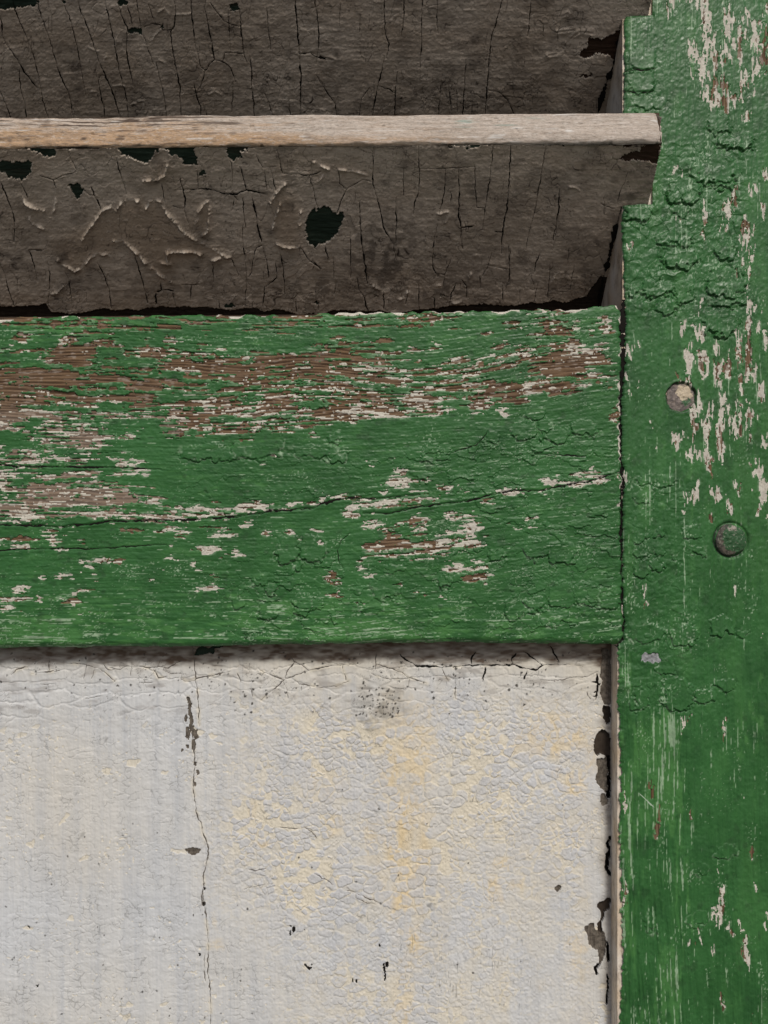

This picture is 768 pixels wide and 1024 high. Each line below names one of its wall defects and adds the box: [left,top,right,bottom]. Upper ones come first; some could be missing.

crack [0,0,438,118]
peeling [666,0,768,122]
peeling [118,148,206,177]
peeling [305,206,344,248]
crack [0,155,628,648]
peeling [0,276,640,592]
peeling [671,167,768,523]
peeling [0,557,126,615]
peeling [594,648,611,806]
crack [12,646,601,1024]
peeling [584,881,628,1005]
peeling [711,868,750,972]